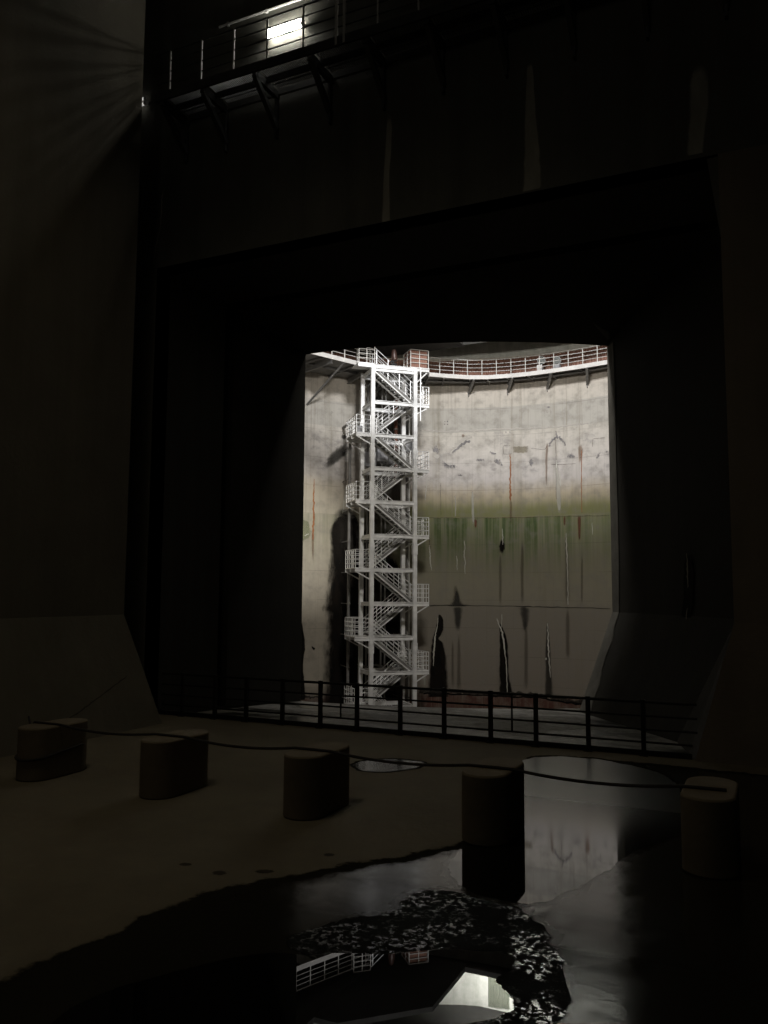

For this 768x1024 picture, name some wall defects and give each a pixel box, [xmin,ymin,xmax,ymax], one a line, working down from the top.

water stain [301,380,588,706]
crack [514,538,609,695]